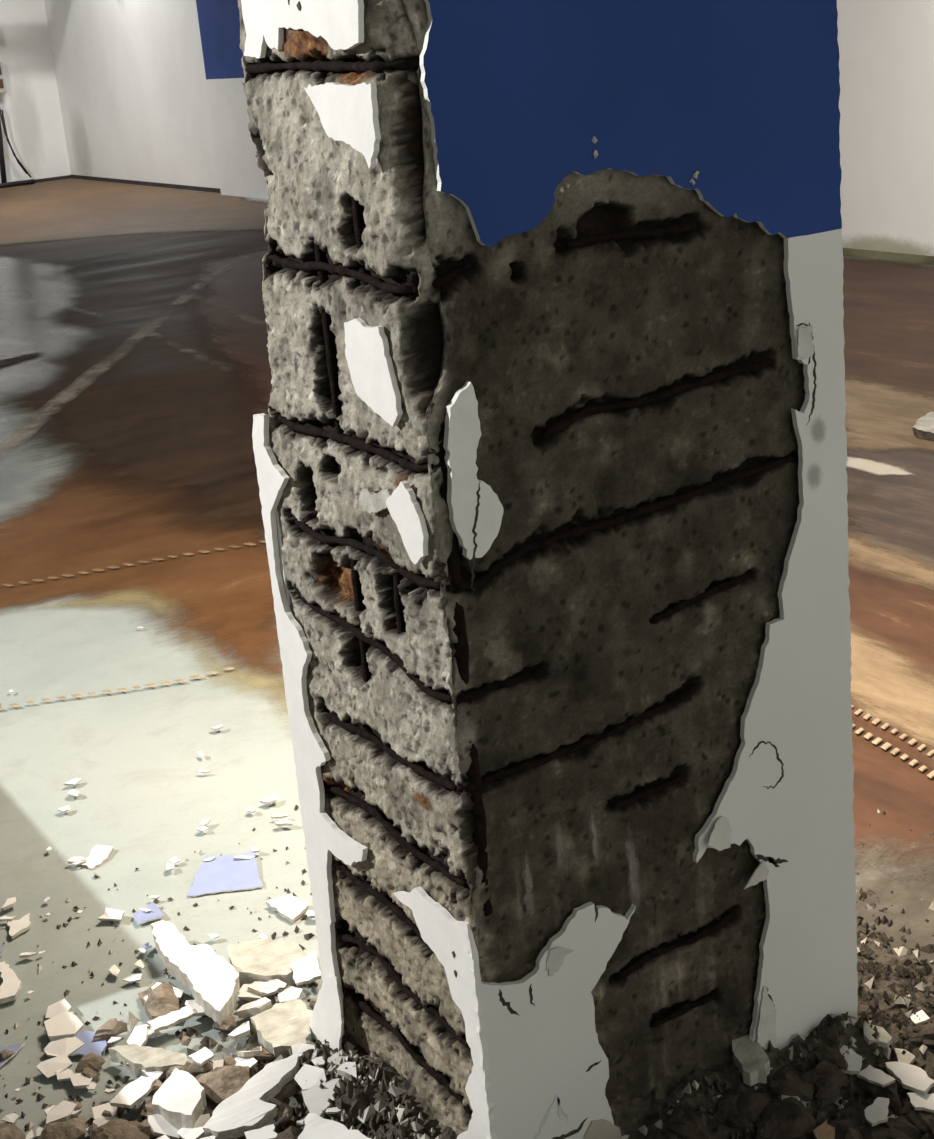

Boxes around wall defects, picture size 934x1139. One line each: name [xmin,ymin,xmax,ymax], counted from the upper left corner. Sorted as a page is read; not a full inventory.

corrosion [282,29,328,61]
corrosion [338,70,371,85]
crack [796,322,817,426]
corrosion [316,562,354,600]
spalling [237,0,814,1139]
damp [62,592,165,608]
crack [749,741,784,789]
spalling [147,1005,192,1033]
spalling [188,1047,214,1066]
spalling [840,1045,862,1074]
spalling [110,1076,156,1109]
spalling [200,1052,299,1139]